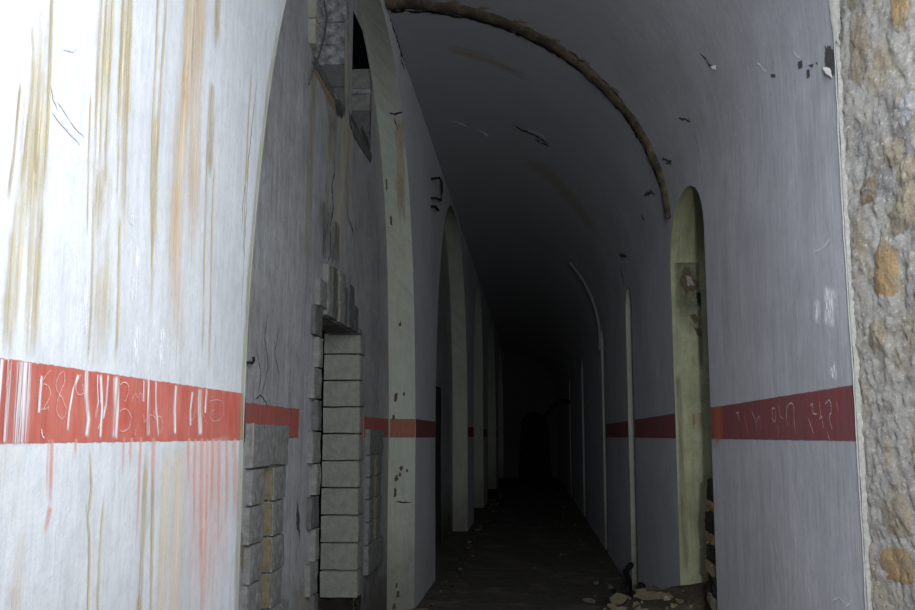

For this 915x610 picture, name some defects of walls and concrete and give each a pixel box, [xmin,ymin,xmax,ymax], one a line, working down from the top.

corrosion [171,0,204,286]
peeling [679,267,702,337]
flaking render [793,0,915,610]